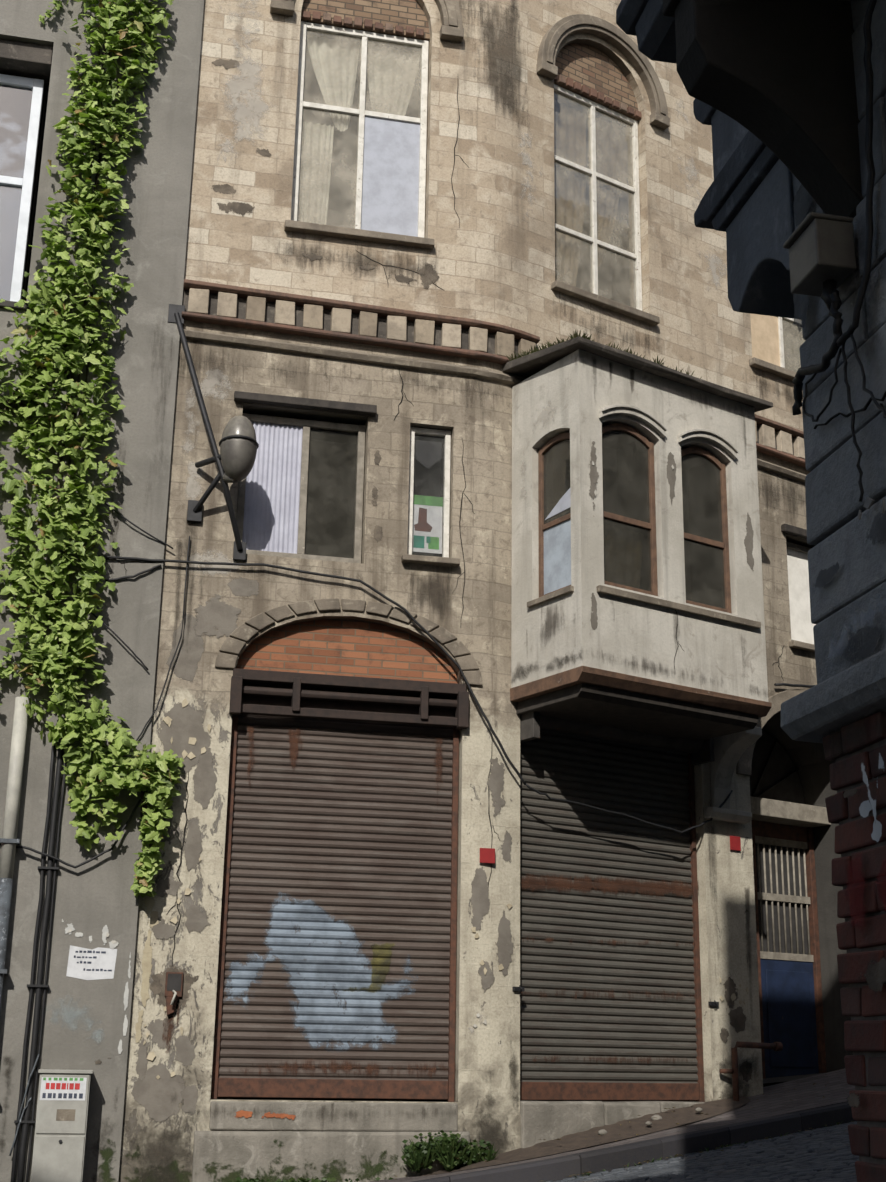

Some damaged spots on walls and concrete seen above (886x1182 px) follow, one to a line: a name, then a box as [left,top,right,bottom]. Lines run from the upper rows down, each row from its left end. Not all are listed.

leakage [270,0,295,16]
leakage [435,0,464,43]
leakage [483,0,520,112]
leakage [536,14,686,130]
spalling [211,184,254,217]
crack [451,87,467,229]
spalling [166,577,259,682]
peeling [487,757,505,817]
peeling [62,919,119,949]
peeling [95,698,217,1123]
peeling [470,866,514,992]
spalling [720,971,749,1043]